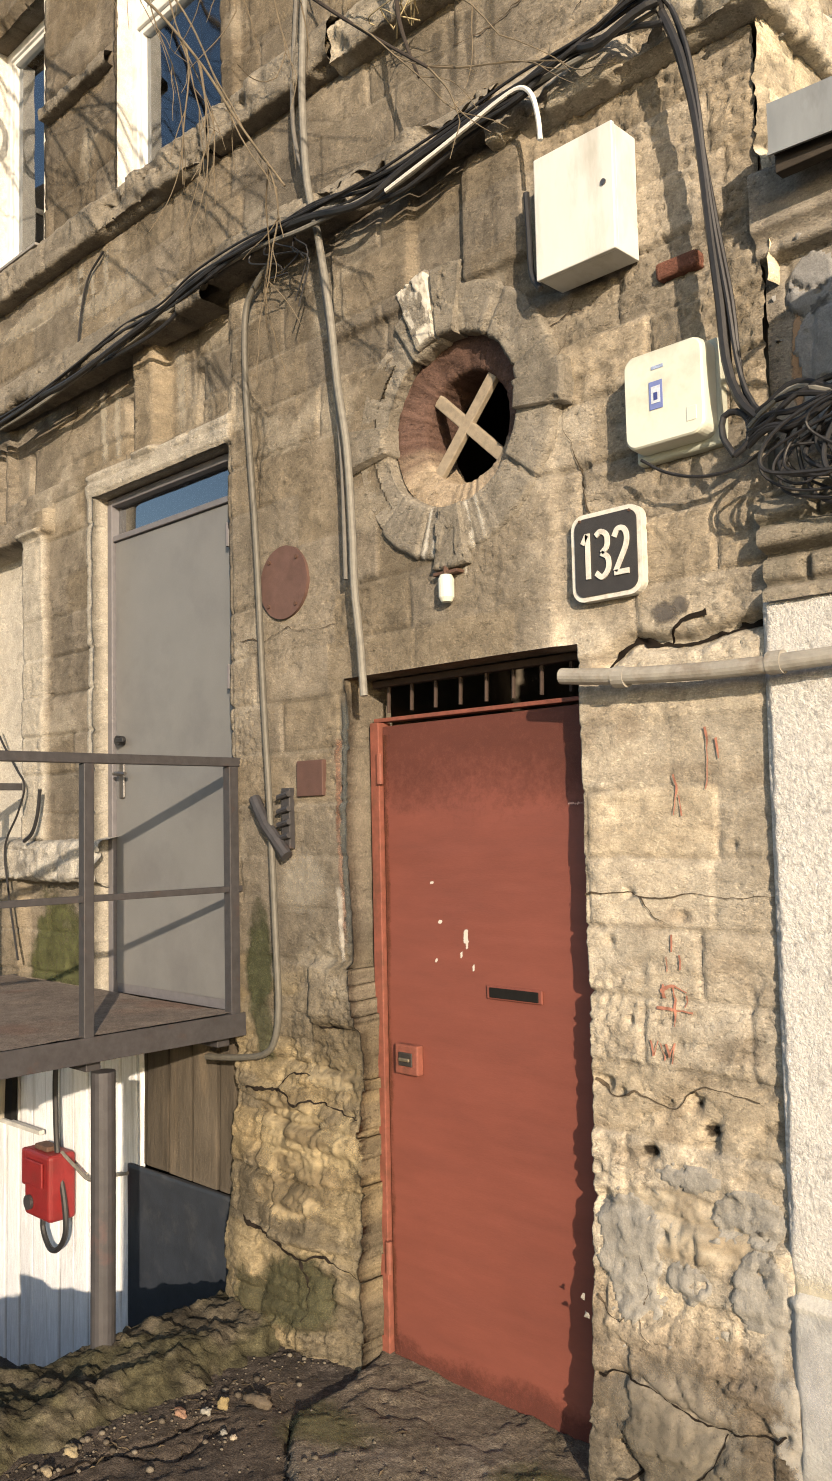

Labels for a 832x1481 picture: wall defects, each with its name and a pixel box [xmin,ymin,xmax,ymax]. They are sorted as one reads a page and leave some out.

spalling [396,272,435,345]
crack [610,608,763,668]
crack [245,1072,357,1121]
crack [243,1214,357,1323]
flaking render [596,1162,804,1481]
crack [597,1257,788,1481]
crack [51,1413,226,1481]